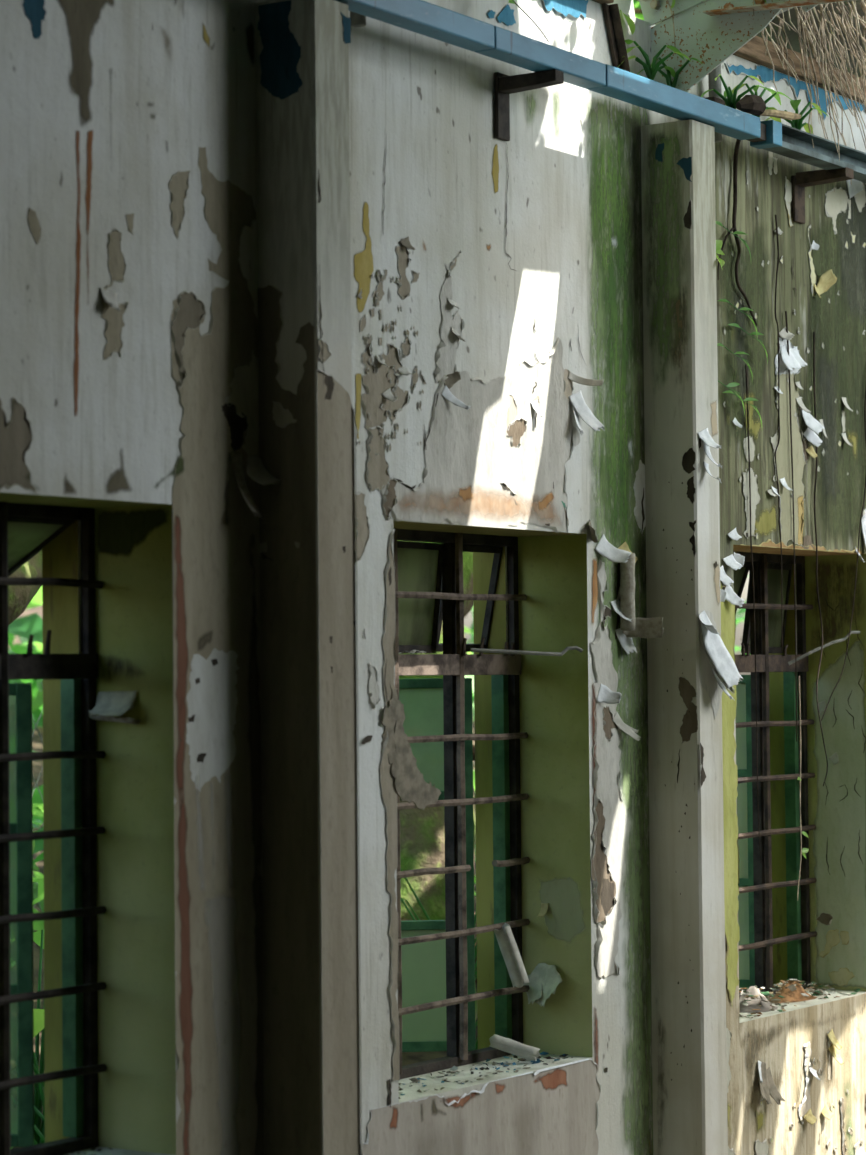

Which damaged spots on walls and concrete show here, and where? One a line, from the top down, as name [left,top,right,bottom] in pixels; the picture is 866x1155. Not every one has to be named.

peeling [0,397,38,493]
corrosion [74,130,93,415]
leakage [592,122,687,618]
spalling [682,428,722,504]
leakage [711,230,769,451]
peeling [720,309,866,607]
leakage [801,182,866,540]
corrosion [175,516,193,1155]
peeling [169,147,608,1155]
leakage [623,638,672,1145]
peeling [677,610,743,789]
peeling [757,1029,866,1155]